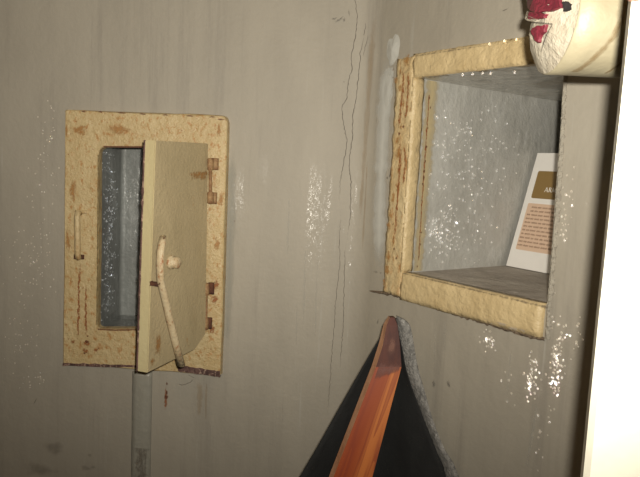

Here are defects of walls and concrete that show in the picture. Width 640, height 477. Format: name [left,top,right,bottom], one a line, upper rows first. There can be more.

crack [340,2,368,218]
corrosion [383,74,410,285]
corrosion [417,95,431,267]
corrosion [77,272,99,354]
crack [328,234,345,400]